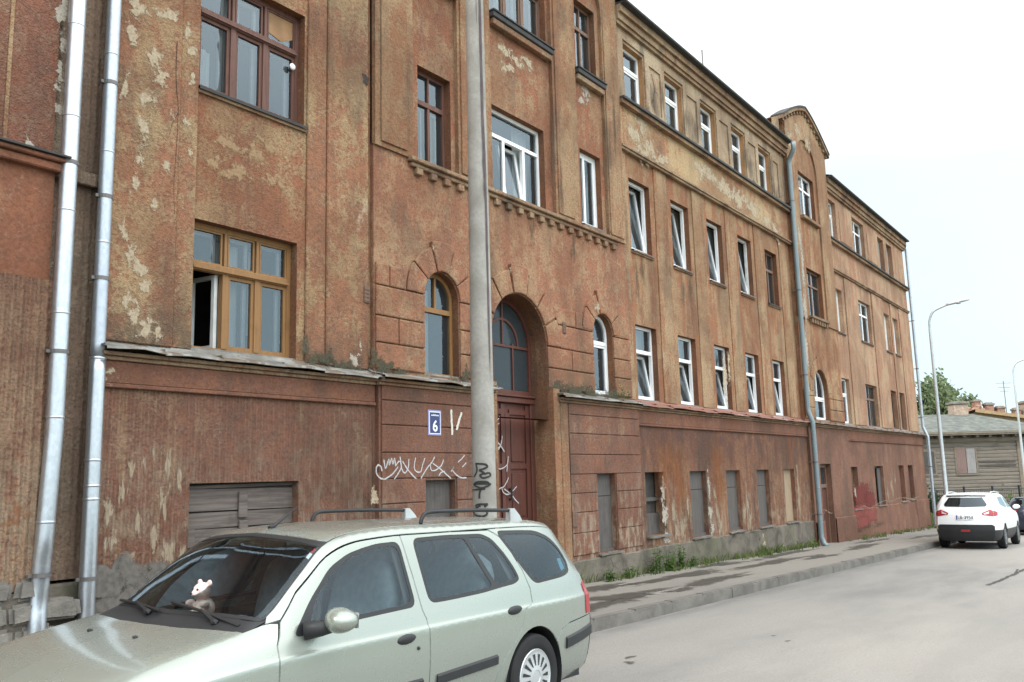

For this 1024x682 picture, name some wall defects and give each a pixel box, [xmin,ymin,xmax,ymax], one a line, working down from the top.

peeling [498,43,532,74]
peeling [119,0,198,194]
peeling [625,114,671,167]
peeling [694,157,784,245]
peeling [118,218,163,341]
water stain [302,335,406,380]
spalling [95,446,185,614]
spalling [660,476,691,544]
spalling [707,469,723,536]